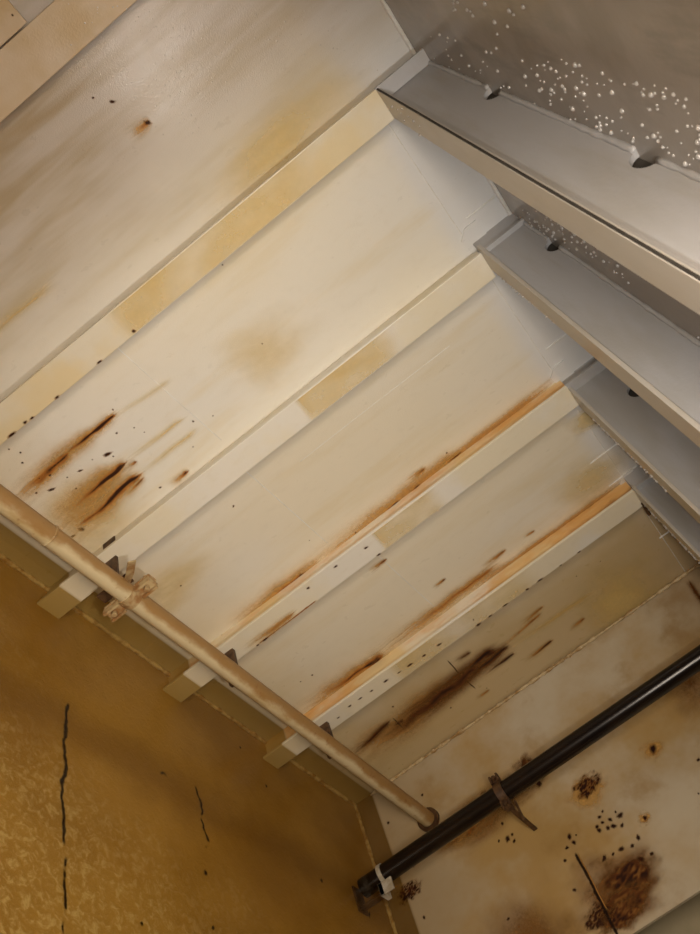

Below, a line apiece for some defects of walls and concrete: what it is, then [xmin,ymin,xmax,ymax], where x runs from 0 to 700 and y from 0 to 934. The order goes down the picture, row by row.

corrosion [21,409,116,494]
corrosion [71,452,144,537]
corrosion [334,390,543,549]
corrosion [256,602,314,646]
corrosion [262,564,315,605]
corrosion [403,488,614,638]
corrosion [322,654,383,699]
corrosion [361,606,543,748]
crack [60,704,69,931]
crack [195,787,209,841]
corrosion [573,774,623,832]
corrosion [573,835,656,930]